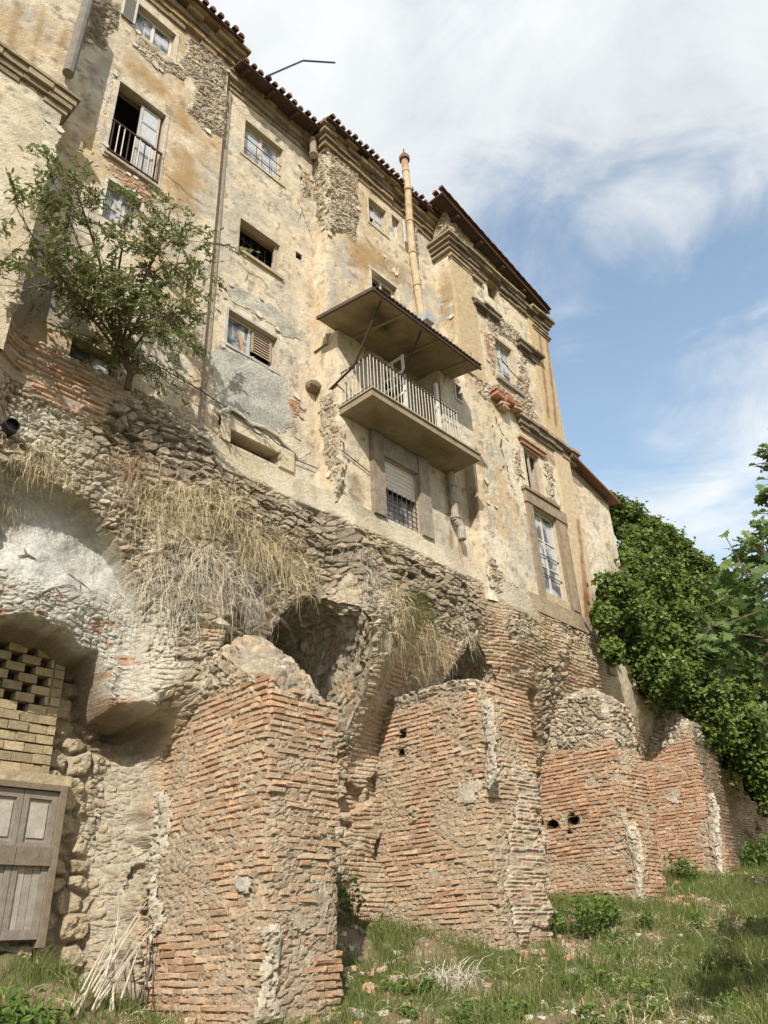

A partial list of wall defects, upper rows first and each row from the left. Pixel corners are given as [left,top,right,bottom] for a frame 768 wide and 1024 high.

flaking render [132,29,230,140]
flaking render [297,147,361,246]
peeling [209,341,346,493]
flaking render [469,315,538,420]